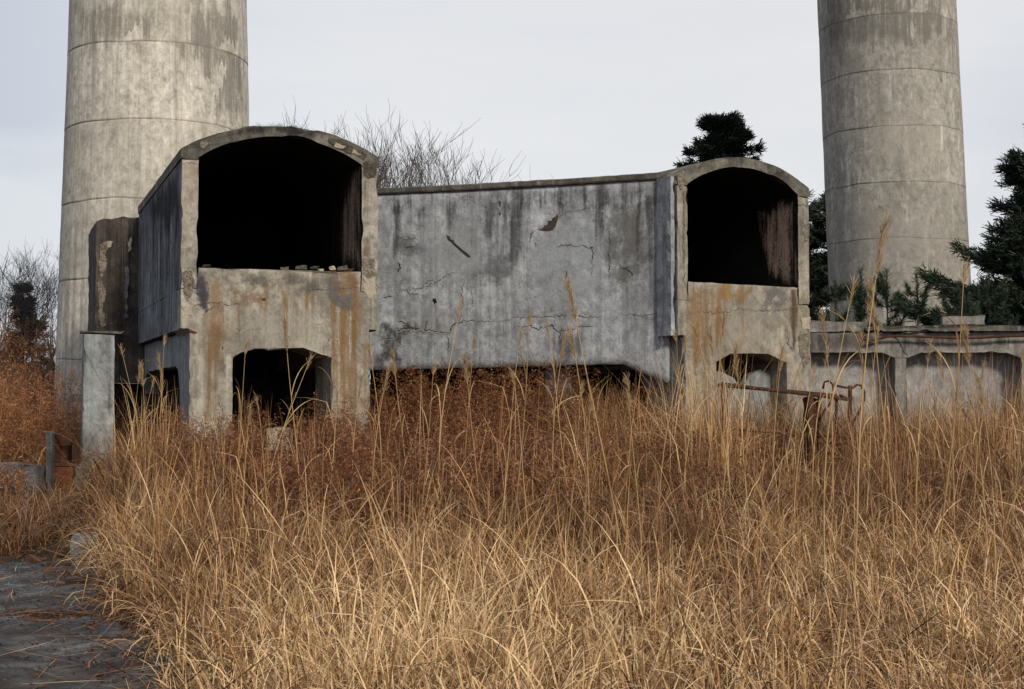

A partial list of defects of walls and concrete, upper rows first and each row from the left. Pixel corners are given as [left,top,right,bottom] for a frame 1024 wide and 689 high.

leakage [181,2,314,135]
peeling [97,241,112,327]
corrosion [331,171,367,417]
crack [379,237,600,349]
spalling [536,211,559,231]
crack [529,230,633,282]